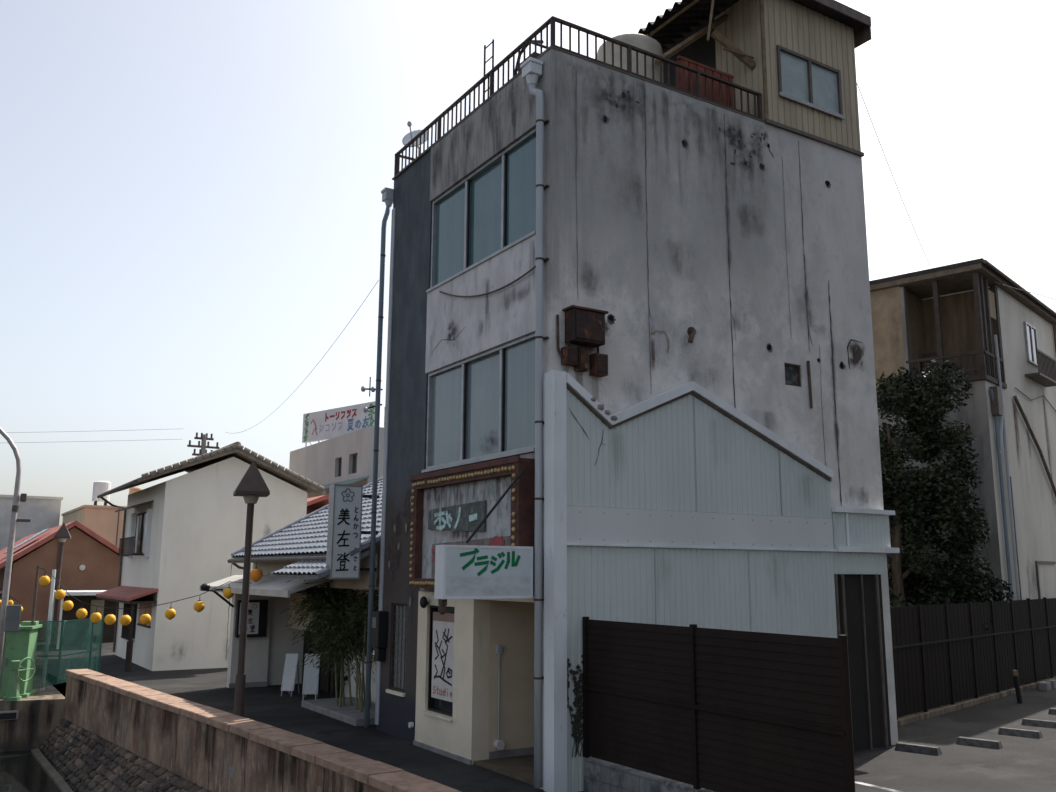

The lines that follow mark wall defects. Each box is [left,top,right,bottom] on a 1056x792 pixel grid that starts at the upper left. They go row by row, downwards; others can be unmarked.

mould [719,127,767,169]